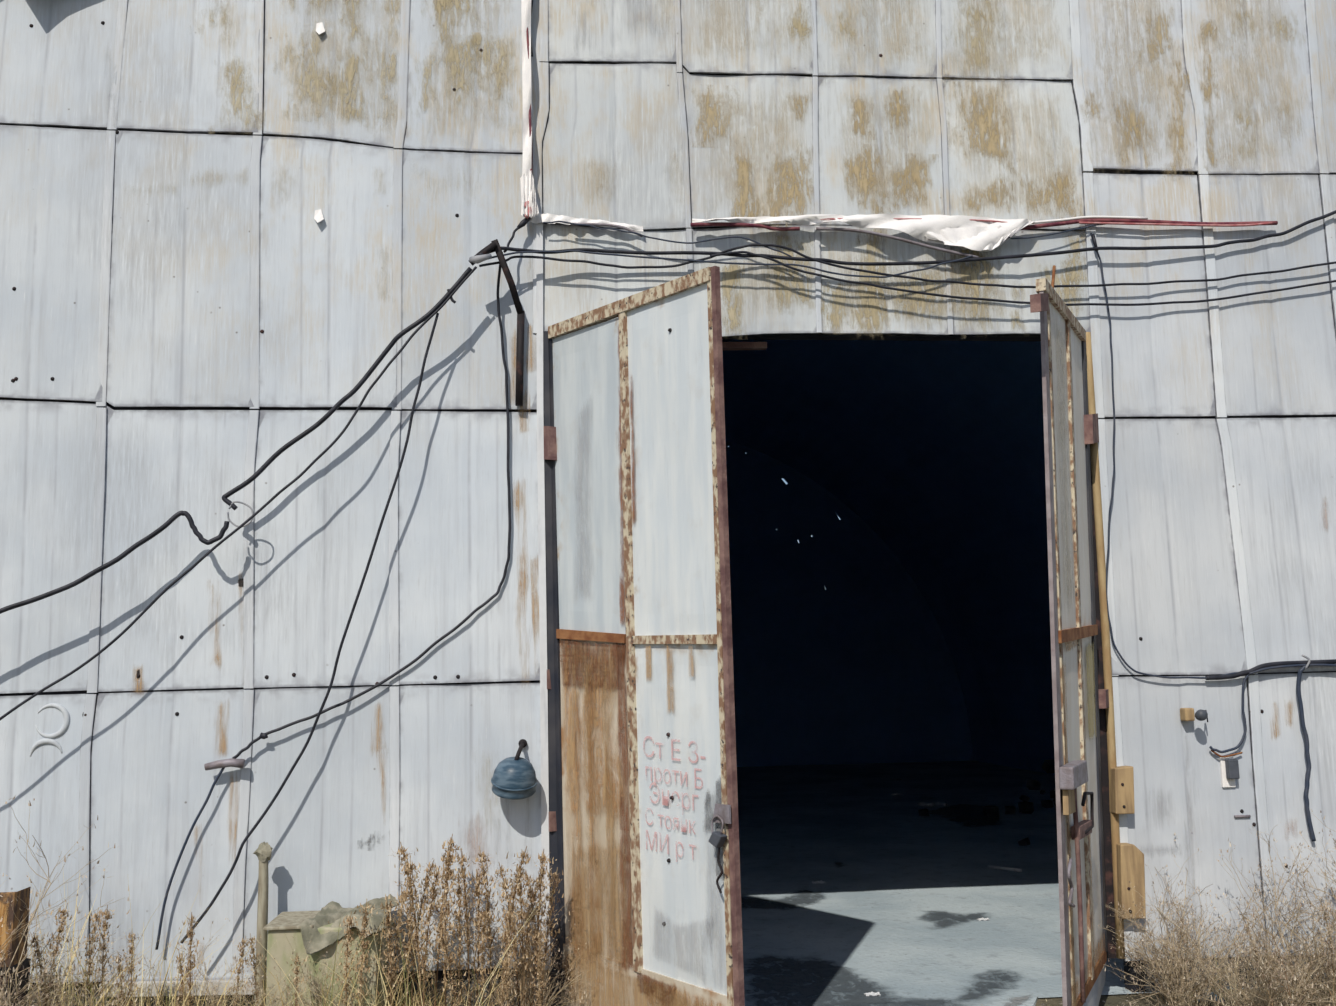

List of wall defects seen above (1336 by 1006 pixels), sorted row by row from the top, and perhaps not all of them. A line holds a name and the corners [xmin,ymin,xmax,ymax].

peeling [227,65,259,125]
peeling [292,22,362,118]
peeling [423,0,512,108]
peeling [734,154,810,217]
peeling [846,99,928,214]
peeling [962,90,1008,158]
peeling [1029,176,1076,217]
peeling [1170,55,1212,171]
corrosion [618,386,635,623]
corrosion [519,563,539,627]
corrosion [1065,639,1096,738]
corrosion [560,639,722,1006]